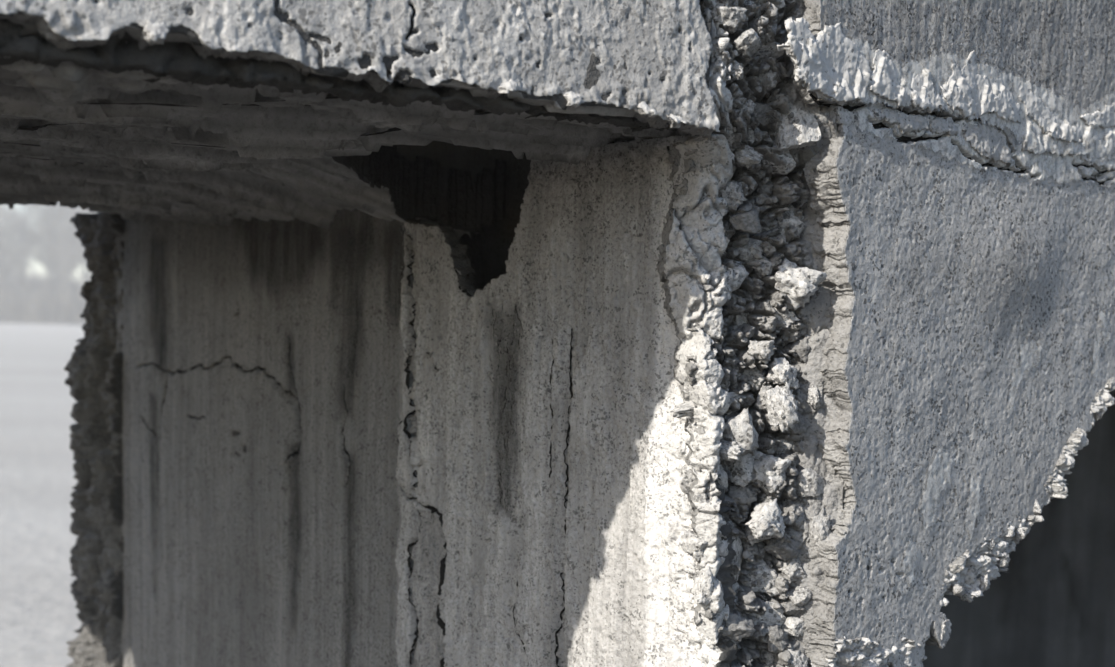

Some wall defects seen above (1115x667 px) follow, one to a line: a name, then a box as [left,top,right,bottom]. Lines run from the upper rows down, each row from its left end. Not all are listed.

crack [809,93,1035,178]
crack [1072,164,1111,185]
crack [453,267,472,297]
spalling [656,0,1115,667]
crack [139,356,302,463]
crack [399,232,447,667]
crack [549,329,573,535]
crack [513,572,565,667]